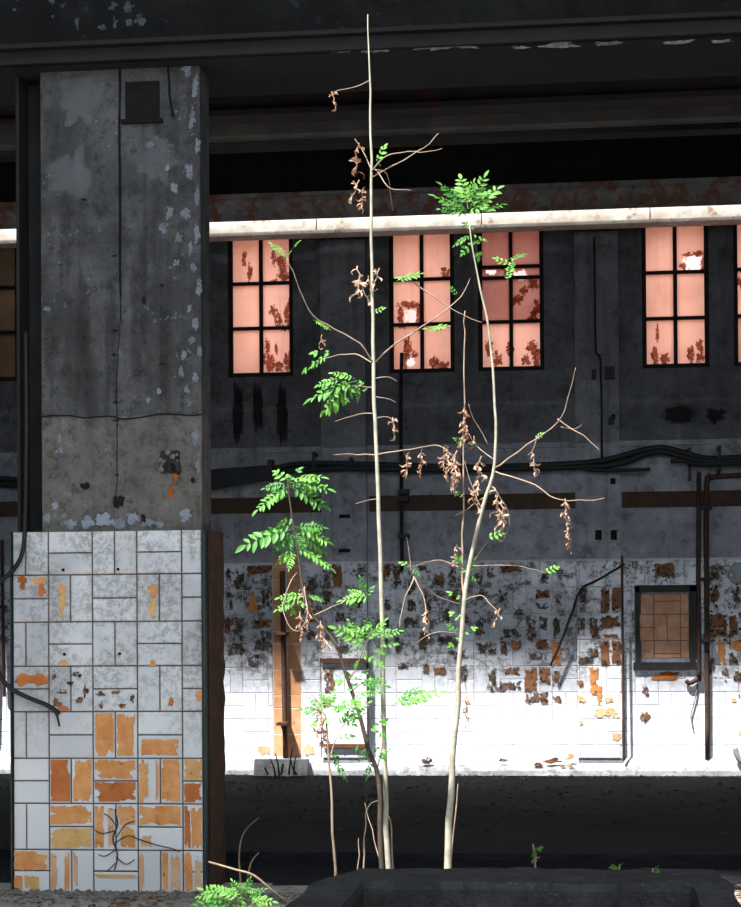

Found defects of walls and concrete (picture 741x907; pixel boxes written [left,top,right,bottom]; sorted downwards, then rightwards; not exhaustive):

peeling [576,587,621,718]
peeling [709,562,741,682]
peeling [14,672,202,892]